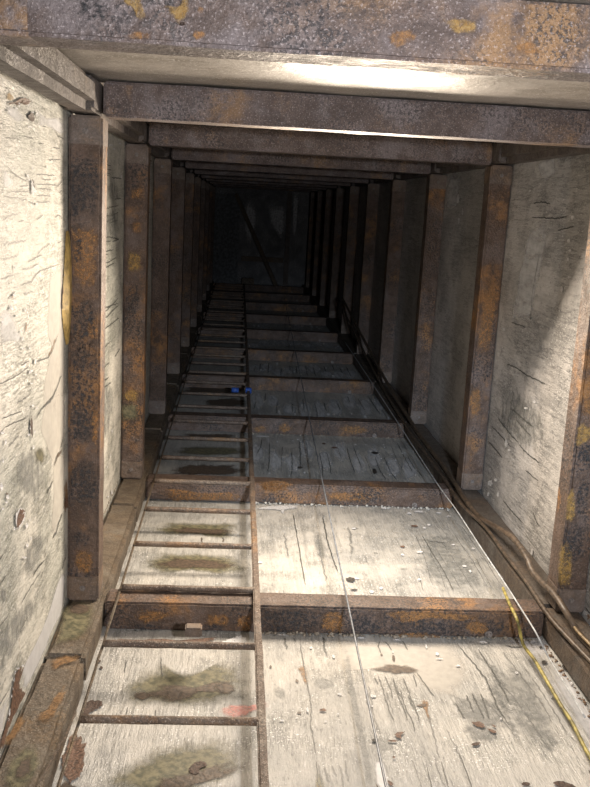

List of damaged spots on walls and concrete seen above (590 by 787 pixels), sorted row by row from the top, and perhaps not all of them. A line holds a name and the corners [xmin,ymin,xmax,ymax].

crack [3,126,63,312]
crack [0,336,58,384]
rust [62,289,99,442]
crack [0,376,62,445]
rust [64,461,96,510]
crack [21,513,66,631]
rust [559,480,590,584]
rust [134,611,250,643]
rust [392,611,509,650]
spalling [0,664,25,750]
rust [41,700,103,787]
rust [352,619,439,755]